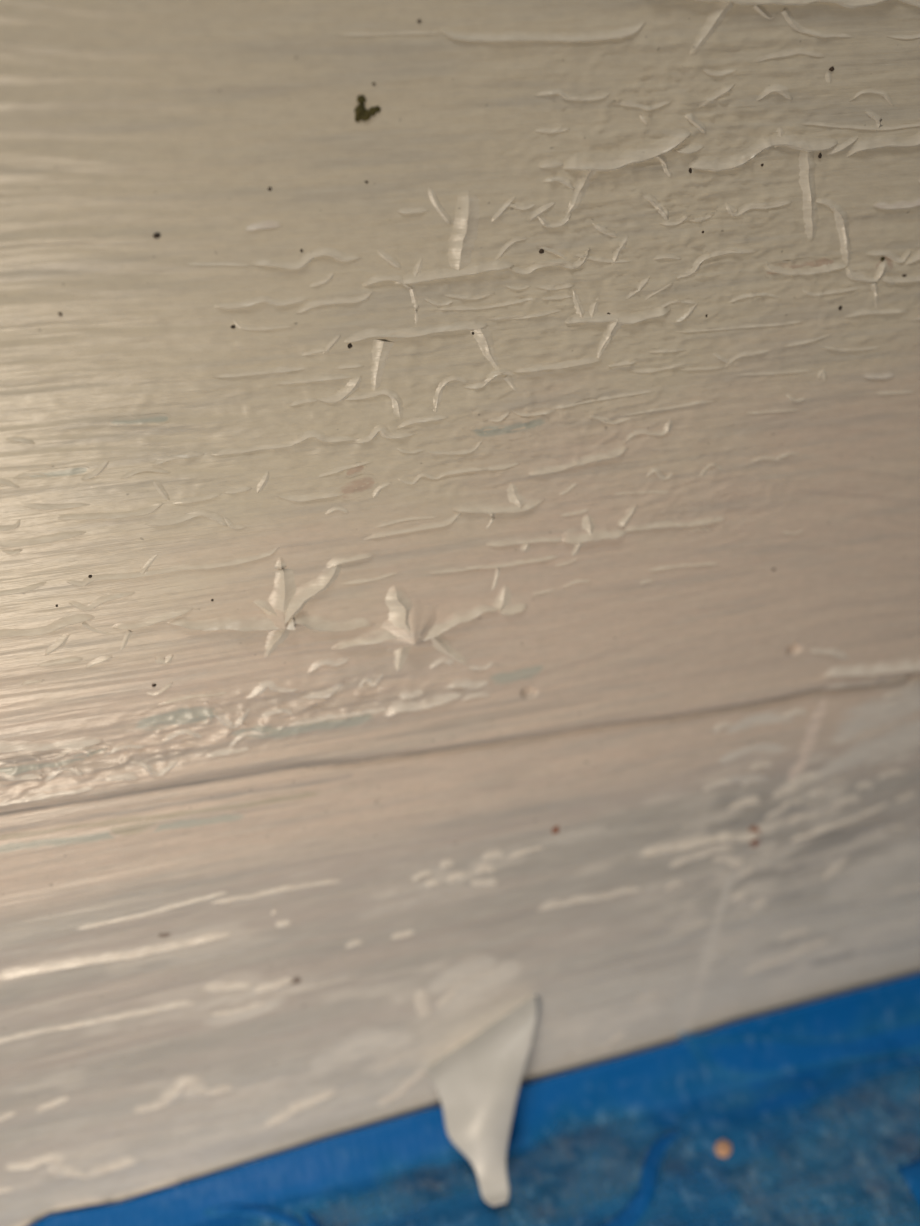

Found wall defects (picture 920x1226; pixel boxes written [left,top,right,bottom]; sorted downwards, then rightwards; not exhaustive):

peeling [205,656,495,758]
peeling [808,648,920,699]
peeling [0,736,180,806]
peeling [377,995,537,1206]